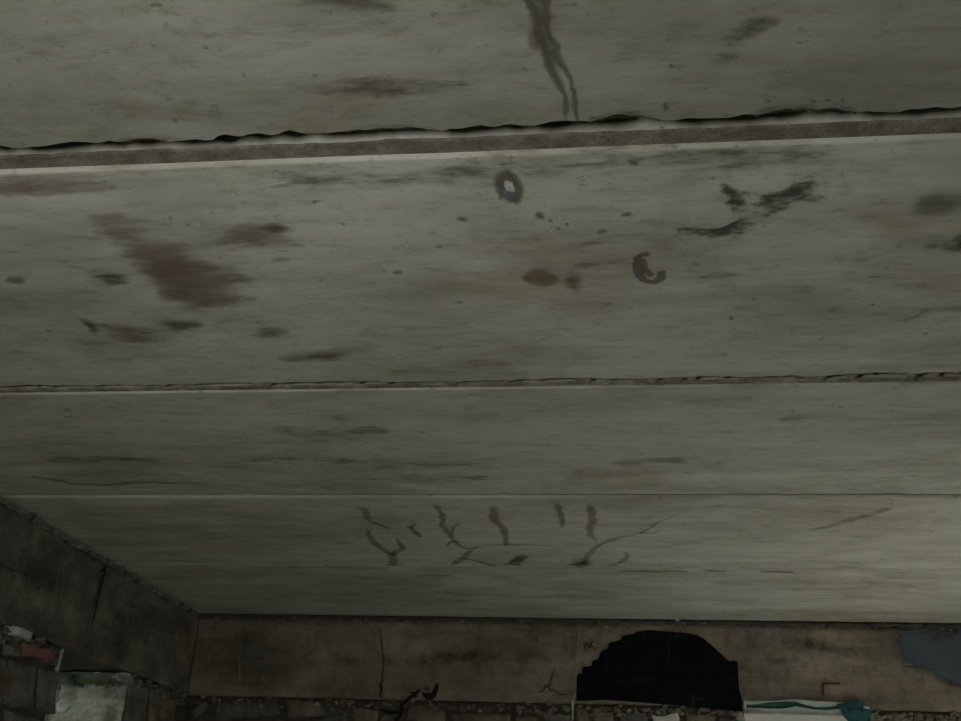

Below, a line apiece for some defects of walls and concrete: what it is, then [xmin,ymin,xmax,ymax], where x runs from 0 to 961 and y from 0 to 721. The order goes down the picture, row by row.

leakage [722,184,744,209]
leakage [759,181,814,216]
leakage [684,220,748,236]